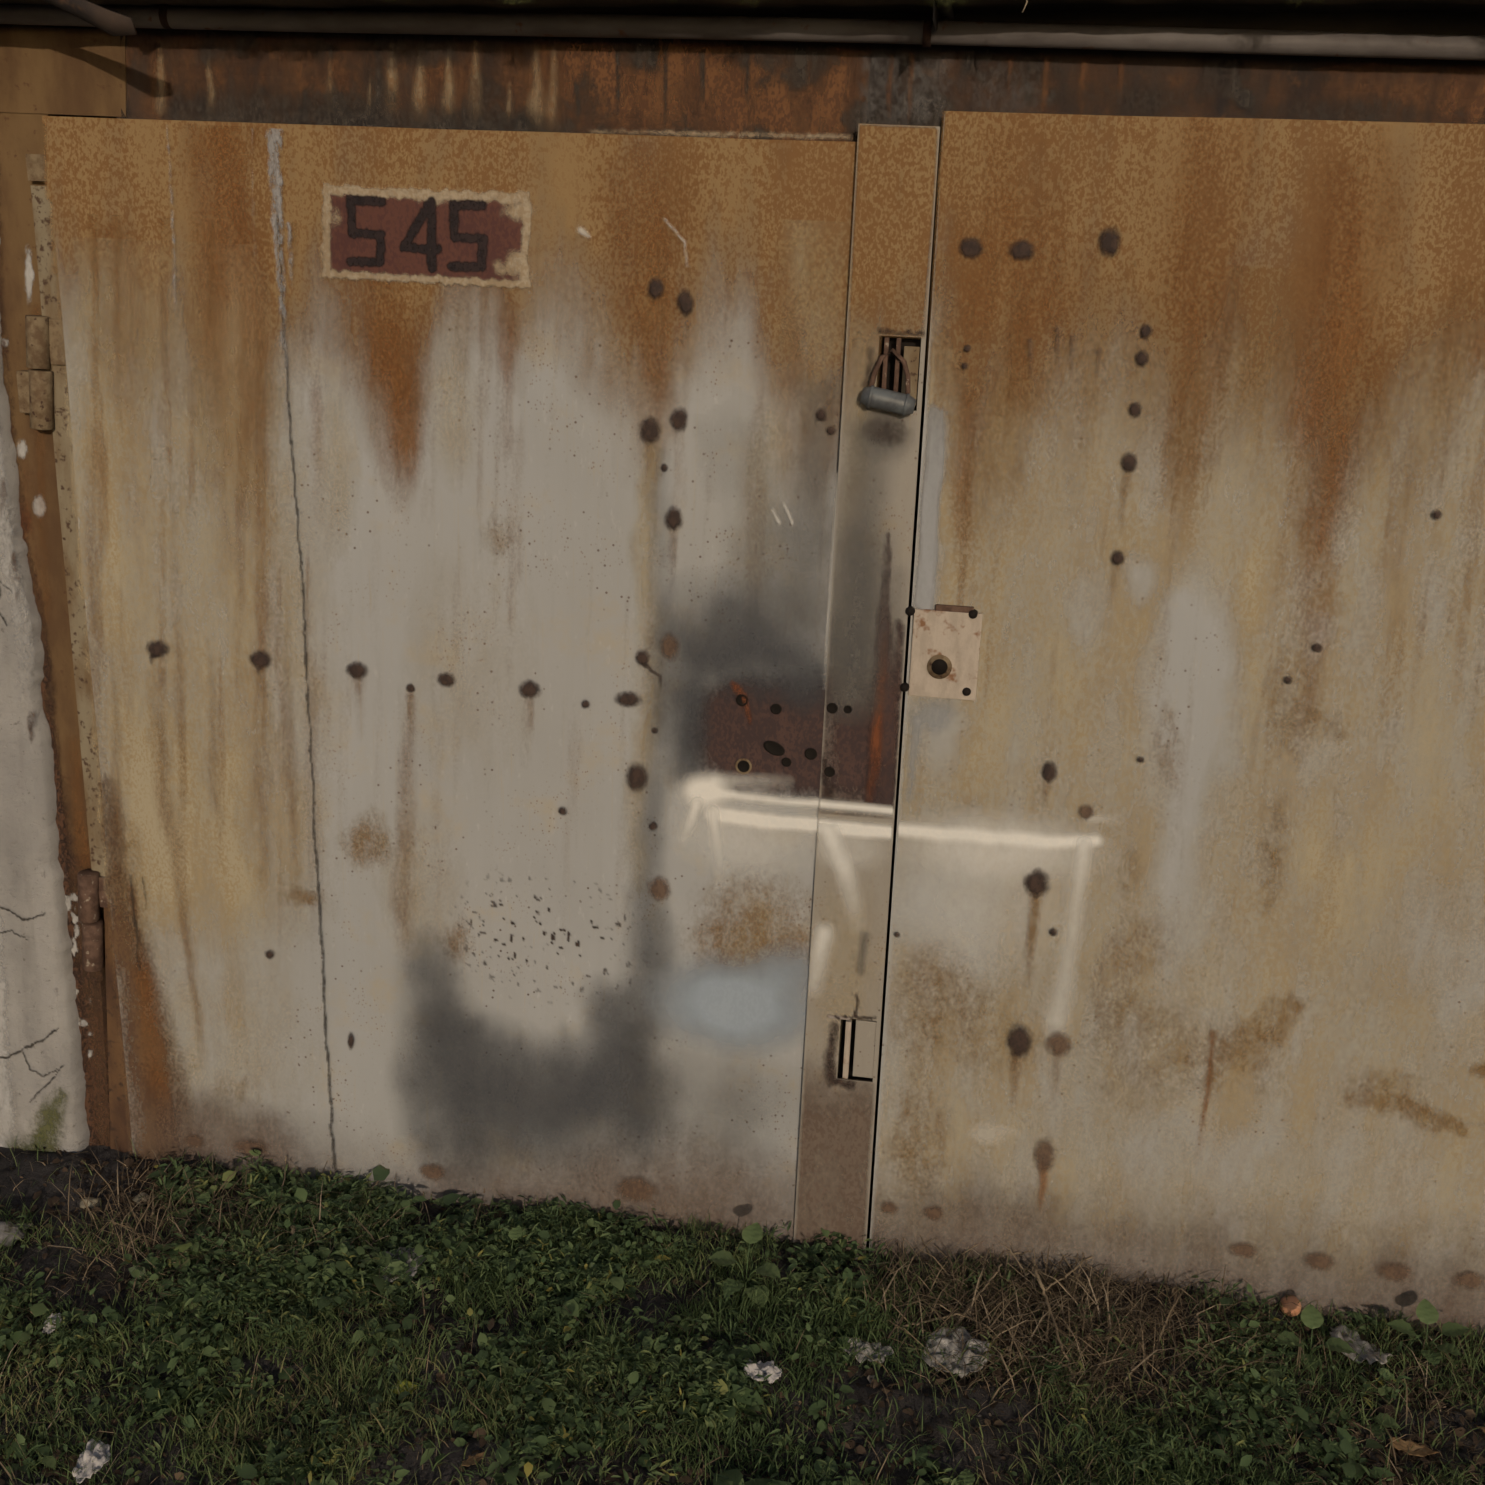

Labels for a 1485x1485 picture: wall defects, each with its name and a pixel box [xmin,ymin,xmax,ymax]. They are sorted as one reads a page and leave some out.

rust [42,35,1485,1181]
crack [0,907,43,940]
crack [0,1028,62,1101]
rust [421,1156,794,1244]
rust [1035,1142,1053,1198]
rust [872,1201,1485,1339]